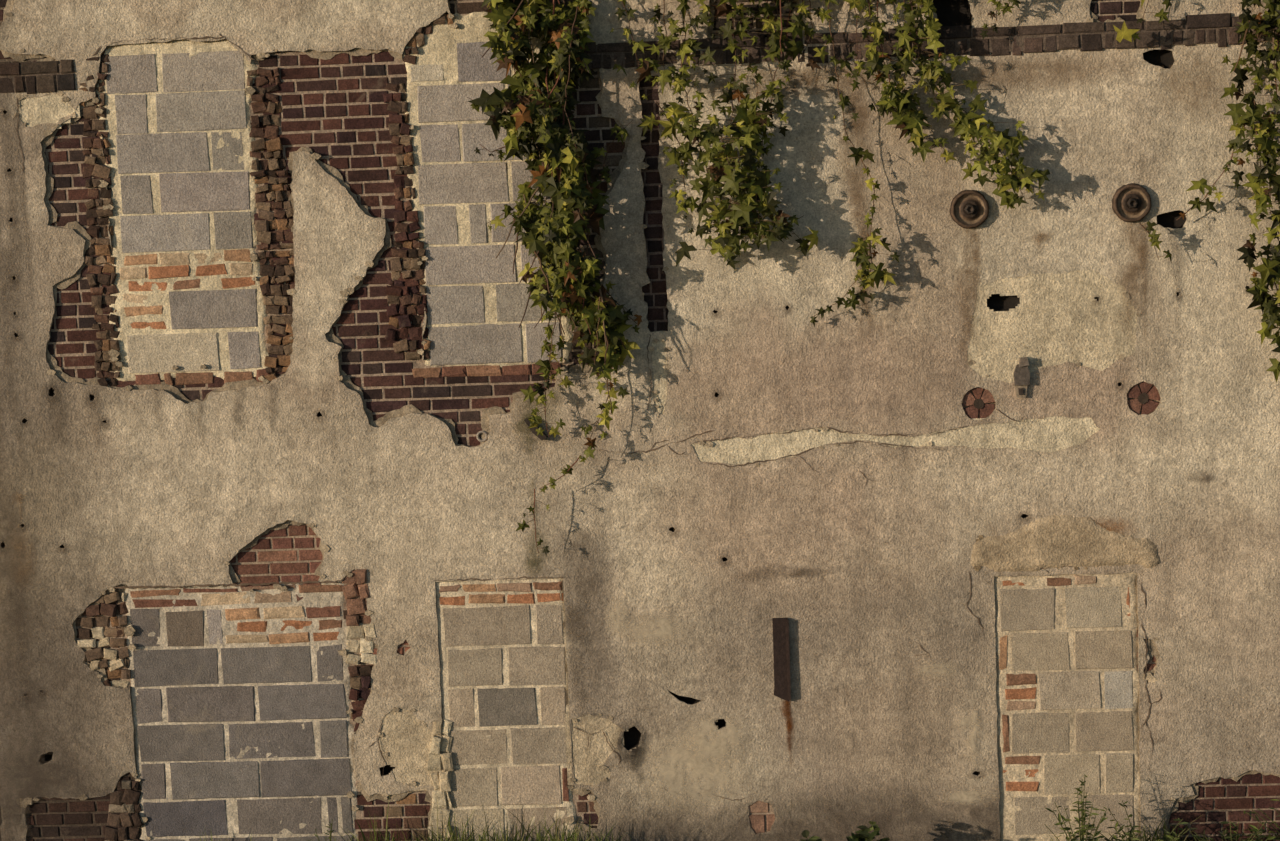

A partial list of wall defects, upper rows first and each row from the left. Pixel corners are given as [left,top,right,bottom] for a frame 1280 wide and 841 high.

spalling [0,0,14,25]
spalling [430,0,489,28]
spalling [0,49,57,65]
spalling [14,48,622,447]
spalling [571,61,672,414]
crack [585,426,966,488]
spalling [73,584,137,688]
crack [1139,585,1162,773]
spalling [16,772,151,841]
peeling [565,713,628,832]
spalling [1162,770,1280,841]